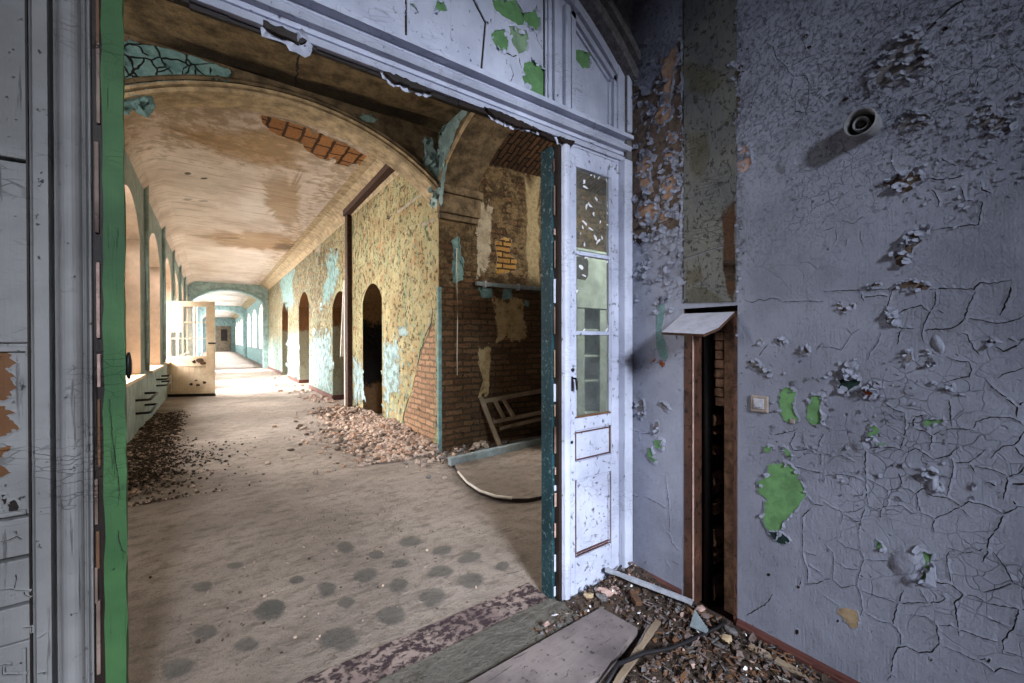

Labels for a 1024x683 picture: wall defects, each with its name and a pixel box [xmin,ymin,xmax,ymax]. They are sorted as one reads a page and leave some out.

peeling [260,19,313,58]
peeling [489,0,548,96]
flaking render [259,115,367,167]
peeling [451,236,465,284]
peeling [631,36,686,368]
peeling [727,0,1024,315]
peeling [0,352,22,478]
peeling [353,357,366,402]
flaking render [381,321,437,443]
peeling [634,398,673,466]
peeling [746,336,966,546]
crack [744,277,1024,682]